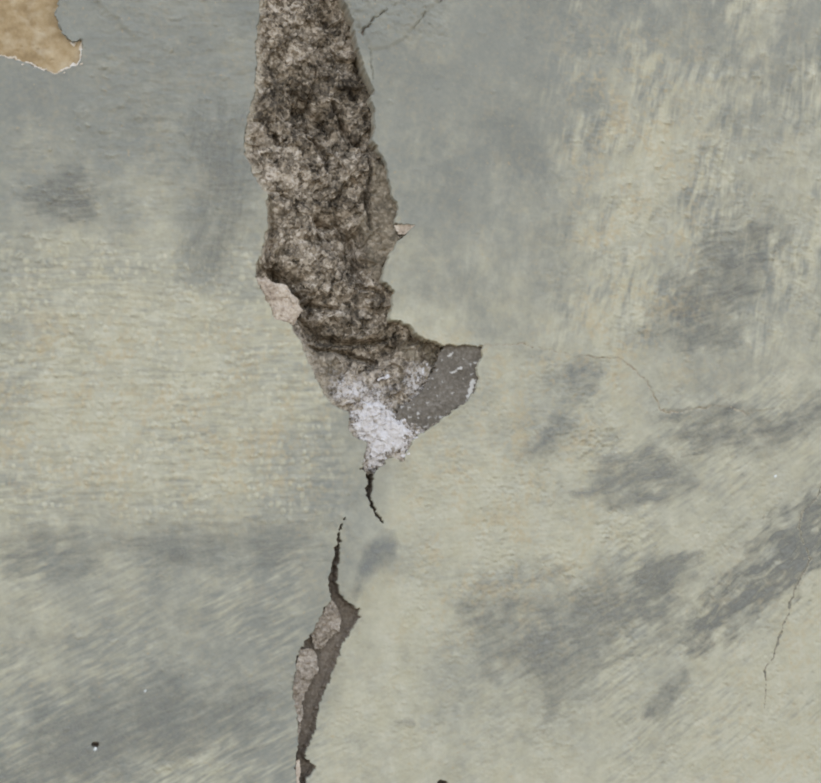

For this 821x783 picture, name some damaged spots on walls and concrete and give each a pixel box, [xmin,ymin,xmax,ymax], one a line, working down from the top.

peeling [0,0,86,74]
flaking render [244,0,481,475]
crack [293,518,360,783]
crack [361,468,383,523]
crack [763,486,821,708]